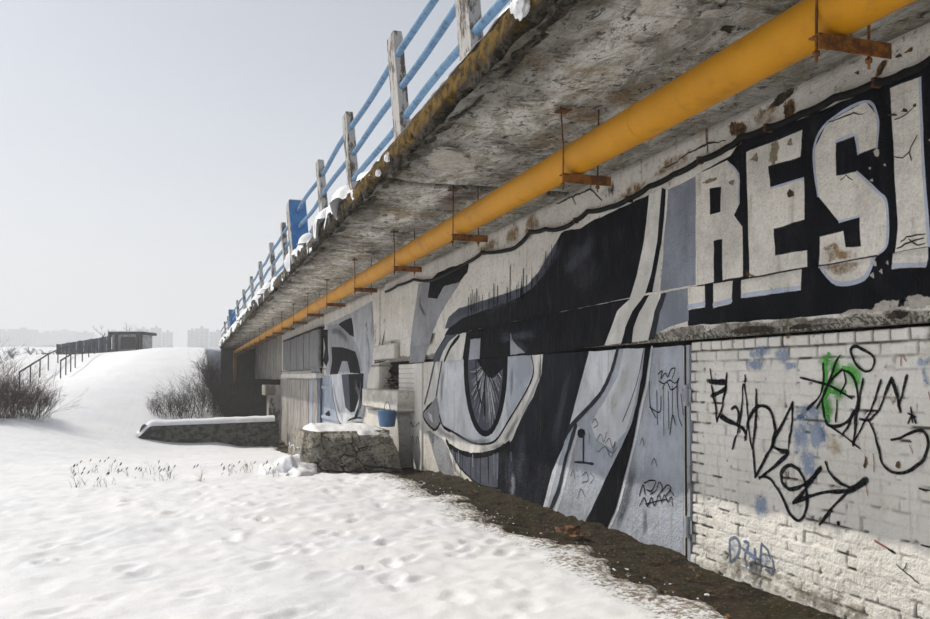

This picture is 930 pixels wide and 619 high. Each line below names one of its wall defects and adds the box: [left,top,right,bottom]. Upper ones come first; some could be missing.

crack [897,233,925,249]
spalling [665,294,930,336]